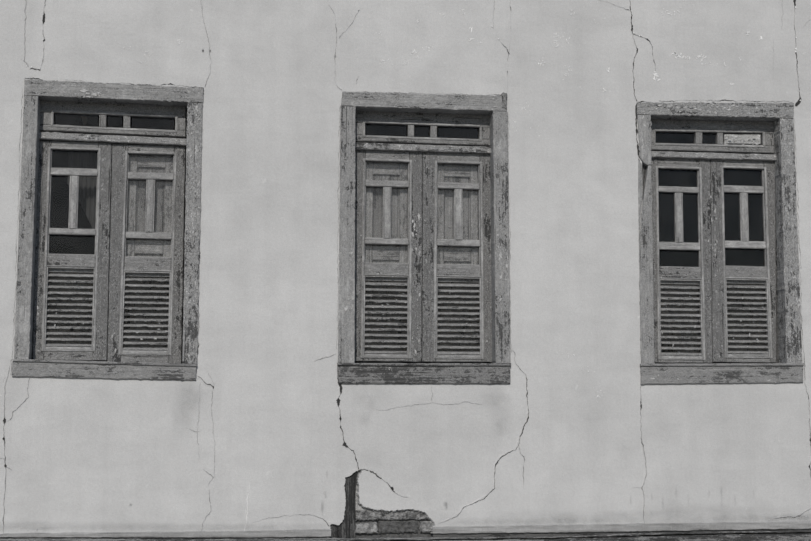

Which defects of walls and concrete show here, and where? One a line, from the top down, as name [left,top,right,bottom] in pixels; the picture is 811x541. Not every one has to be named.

crack [21,0,46,72]
crack [601,0,656,101]
crack [773,0,811,106]
crack [1,366,30,534]
crack [191,371,215,529]
crack [336,384,409,498]
flaking render [330,470,435,538]
crack [440,350,529,523]
crack [634,384,647,523]
crack [803,383,811,484]